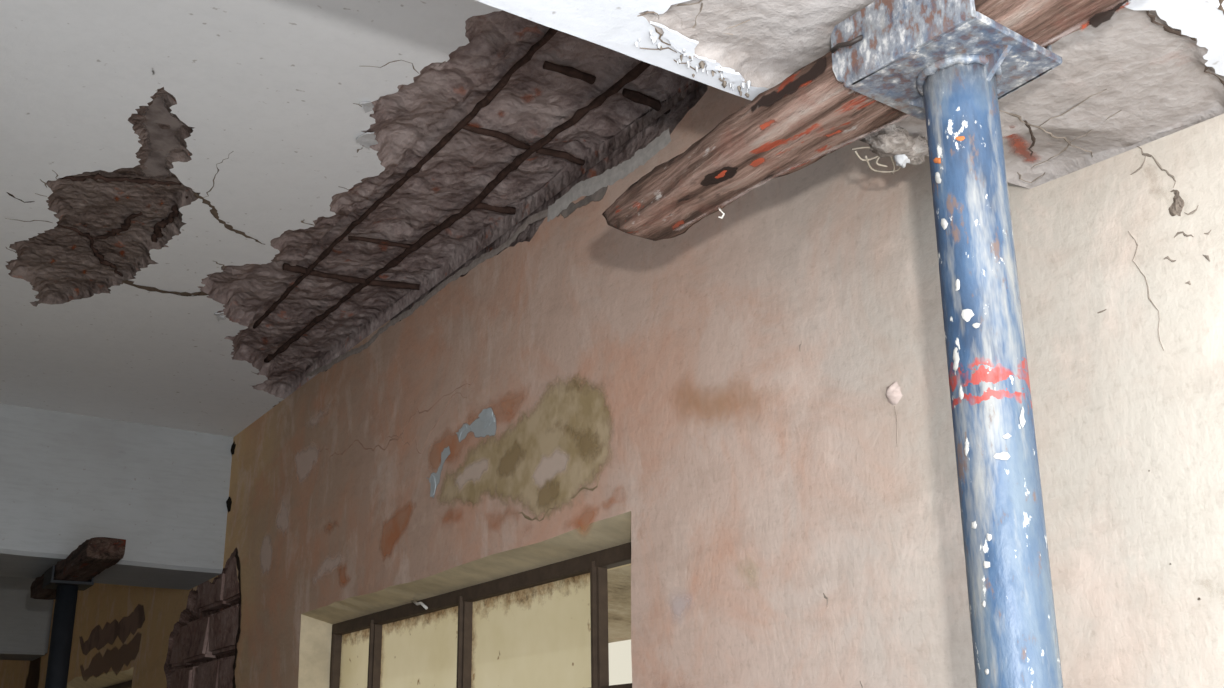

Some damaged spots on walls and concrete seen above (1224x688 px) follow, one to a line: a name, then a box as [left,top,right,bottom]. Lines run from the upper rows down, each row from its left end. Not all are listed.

spalling [998,5,1224,216]
spalling [5,87,200,307]
crack [194,152,265,245]
spalling [198,0,876,407]
crack [122,280,209,296]
crack [1128,231,1164,351]
peeling [427,376,612,521]
peeling [79,604,145,681]
flaking render [164,547,241,688]